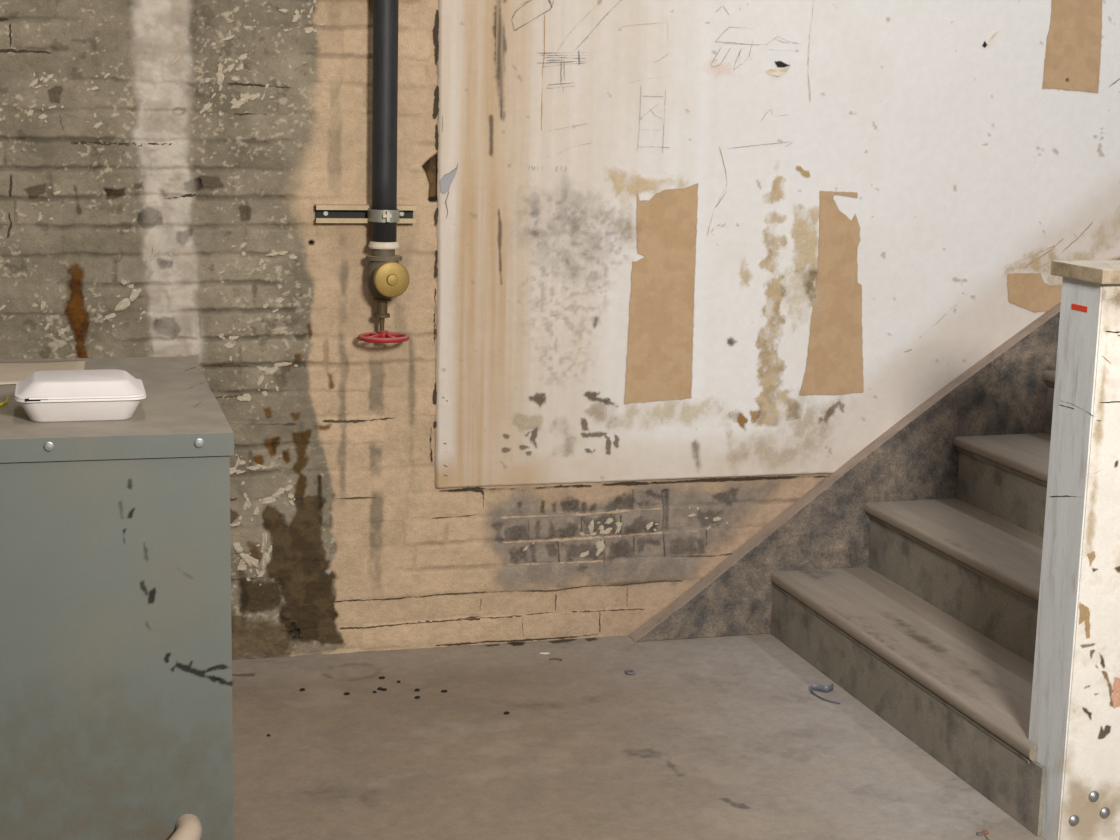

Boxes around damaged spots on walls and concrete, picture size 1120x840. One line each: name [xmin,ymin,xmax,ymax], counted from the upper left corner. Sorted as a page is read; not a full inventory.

peeling [1042,0,1102,93]
leakage [611,172,656,194]
corrosion [65,265,89,358]
peeling [624,184,698,404]
leakage [782,205,820,312]
peeling [799,191,863,395]
peeling [1007,273,1062,312]
spalling [581,418,619,454]
peeling [233,532,272,586]
leakage [231,430,343,657]
peeling [1079,603,1120,708]
peeling [1083,708,1111,739]